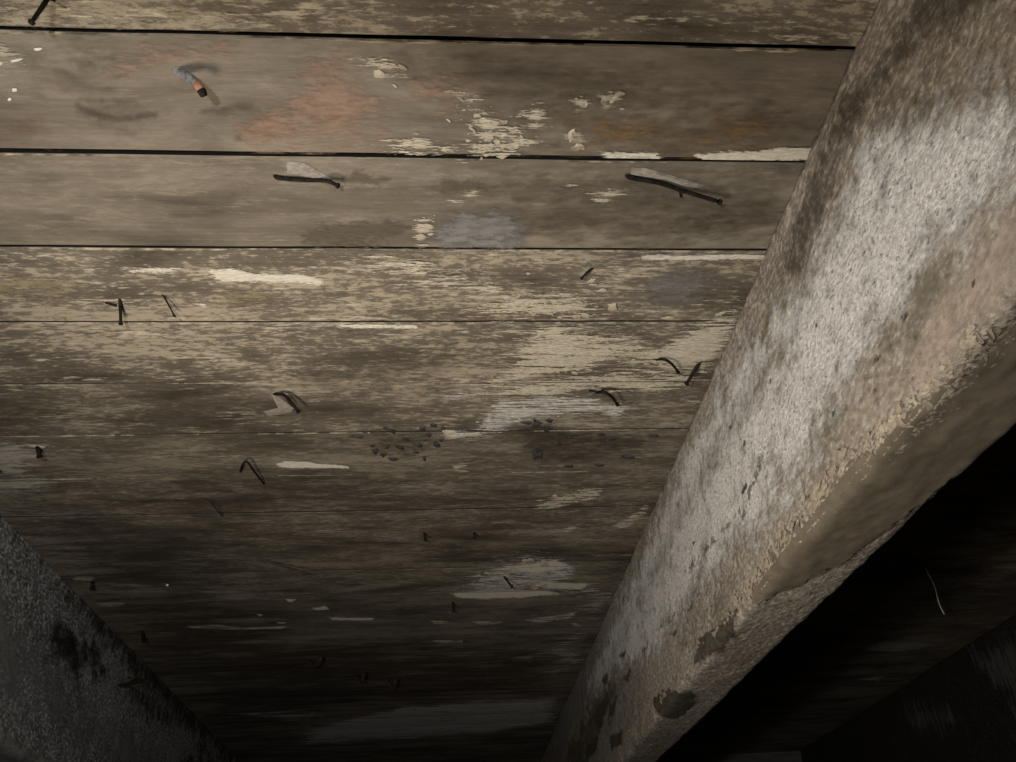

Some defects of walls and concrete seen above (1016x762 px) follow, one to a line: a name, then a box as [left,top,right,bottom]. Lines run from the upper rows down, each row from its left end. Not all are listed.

peeling [350,58,408,88]
peeling [381,90,553,163]
peeling [568,129,585,150]
peeling [601,91,625,110]
damp [435,186,776,249]
damp [554,68,1016,762]
damp [40,559,238,762]